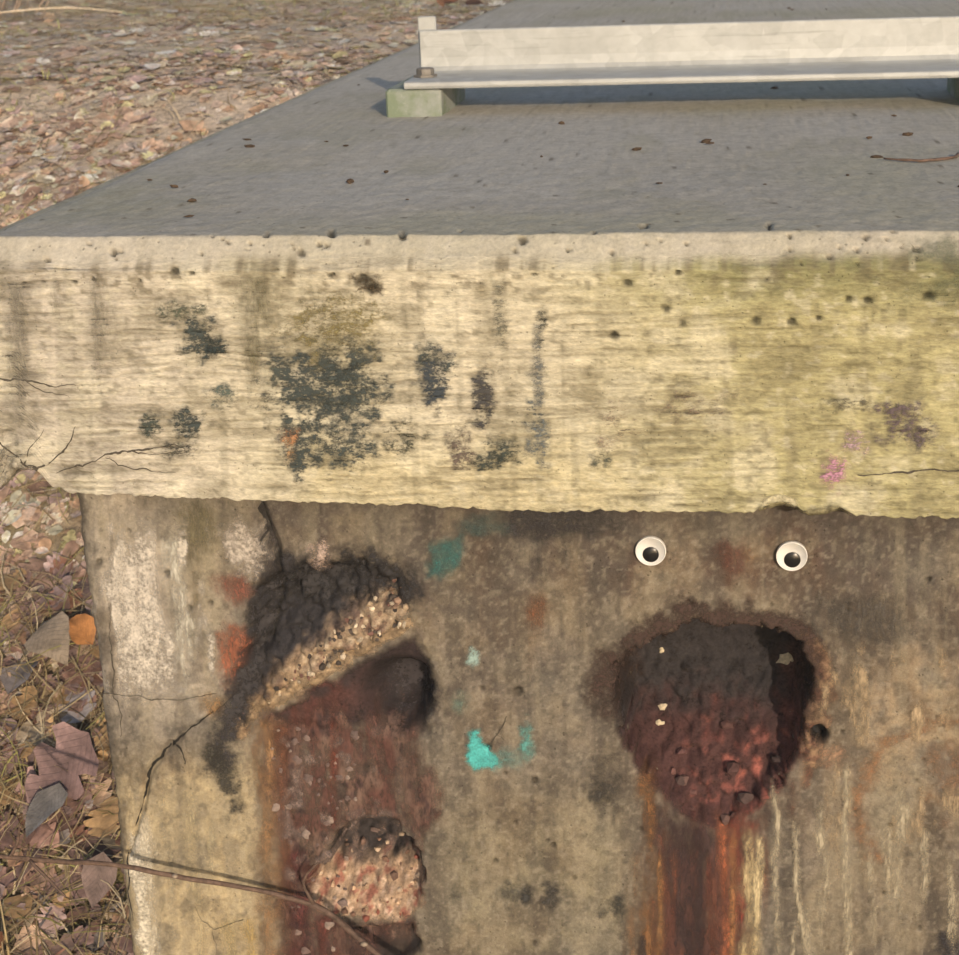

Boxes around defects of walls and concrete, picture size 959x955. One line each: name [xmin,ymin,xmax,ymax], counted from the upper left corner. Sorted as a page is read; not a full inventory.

crack [0,378,76,397]
crack [0,426,185,473]
crack [858,468,959,476]
crack [96,599,236,825]
spalling [236,560,434,955]
rust [259,694,443,955]
rust [629,776,753,955]
spalling [584,599,843,828]
damp [741,786,780,955]
damp [791,831,810,955]
damp [816,770,852,955]
damp [885,796,928,896]